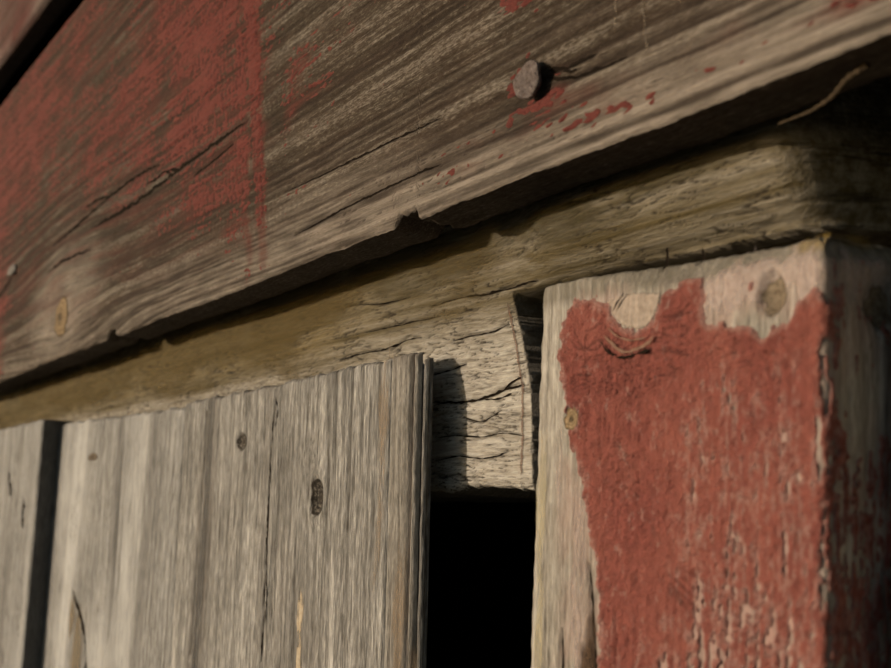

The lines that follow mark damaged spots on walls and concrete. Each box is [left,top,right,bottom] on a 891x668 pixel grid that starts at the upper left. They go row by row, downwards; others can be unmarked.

crack [48,119,249,273]
peeling [0,0,354,378]
peeling [506,87,633,137]
crack [261,398,278,654]
crack [437,377,522,461]
peeling [557,258,891,668]
crack [73,593,87,668]